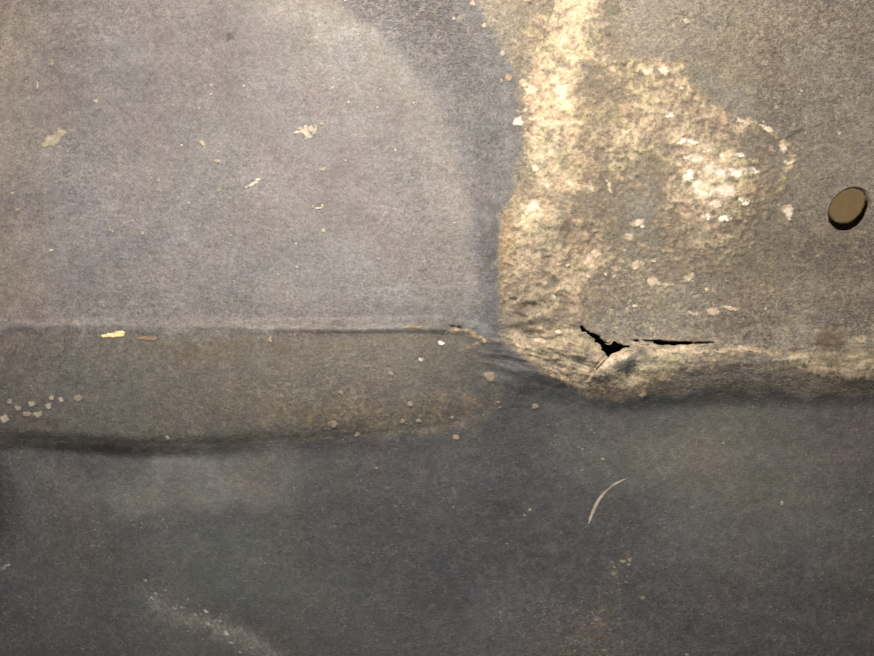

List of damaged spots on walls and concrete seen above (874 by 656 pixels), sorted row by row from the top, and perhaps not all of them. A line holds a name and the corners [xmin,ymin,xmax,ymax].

water stain [497,0,639,199]
crack [580,326,708,357]